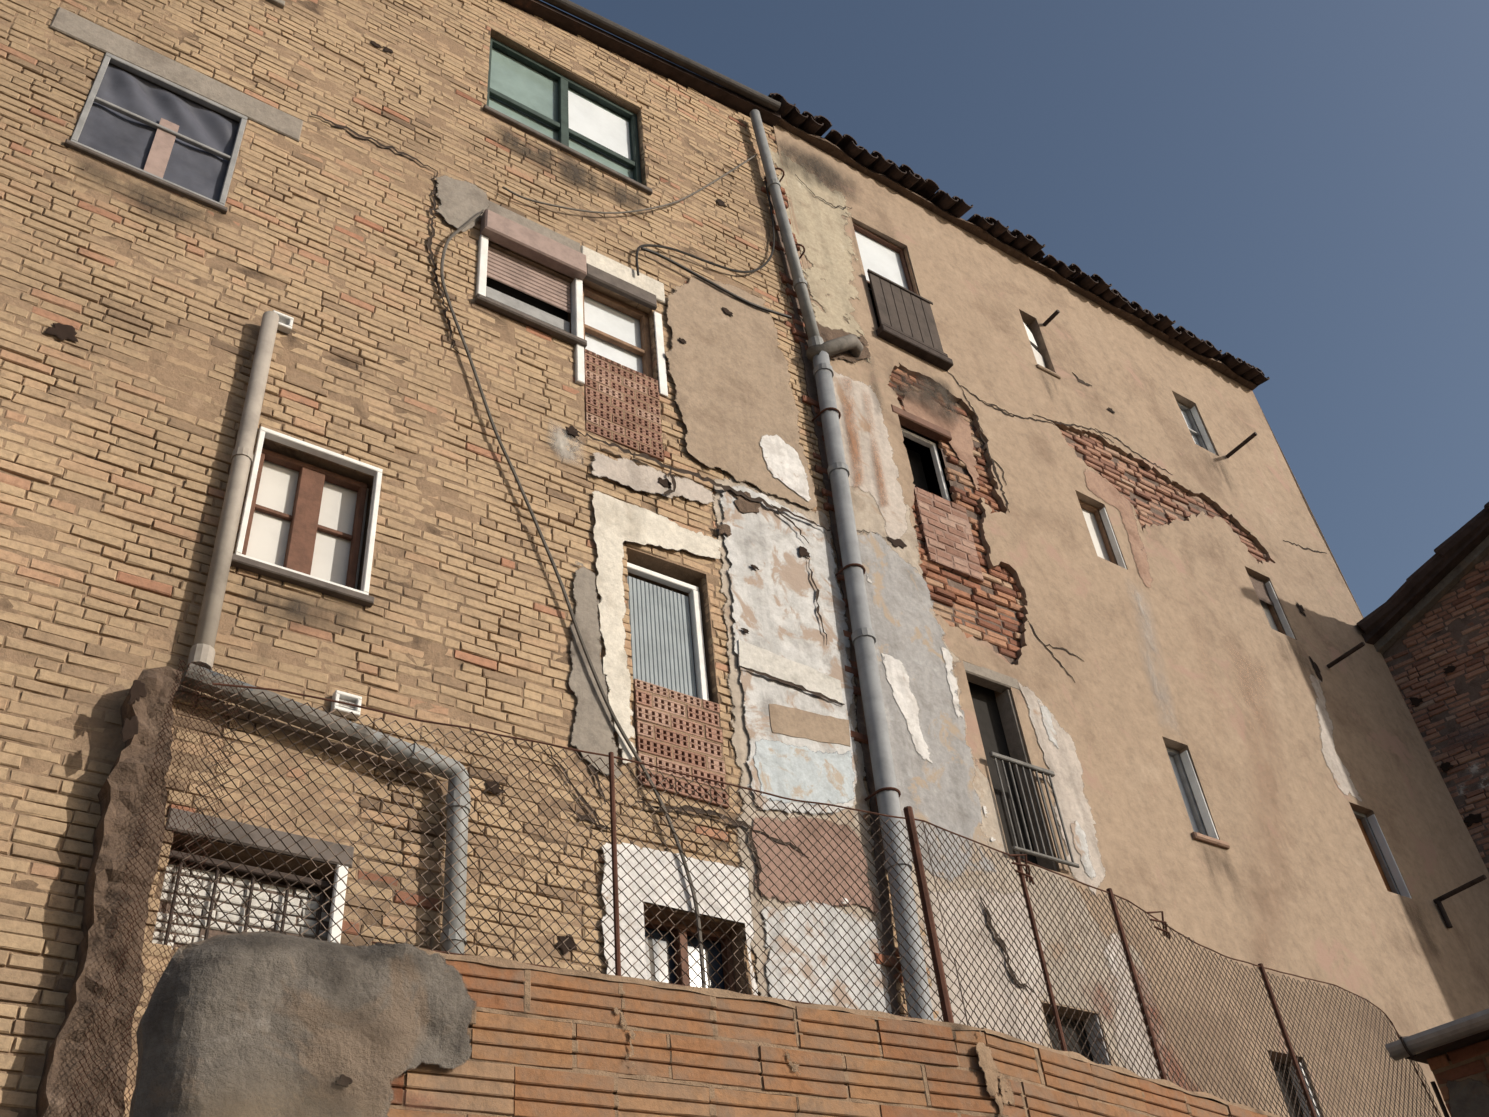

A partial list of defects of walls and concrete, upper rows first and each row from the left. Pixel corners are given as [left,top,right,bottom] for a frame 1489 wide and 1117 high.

crack [311,112,458,355]
crack [947,371,1172,512]
spalling [1057,426,1274,606]
flaking render [592,147,1171,1081]
crack [1027,619,1083,682]